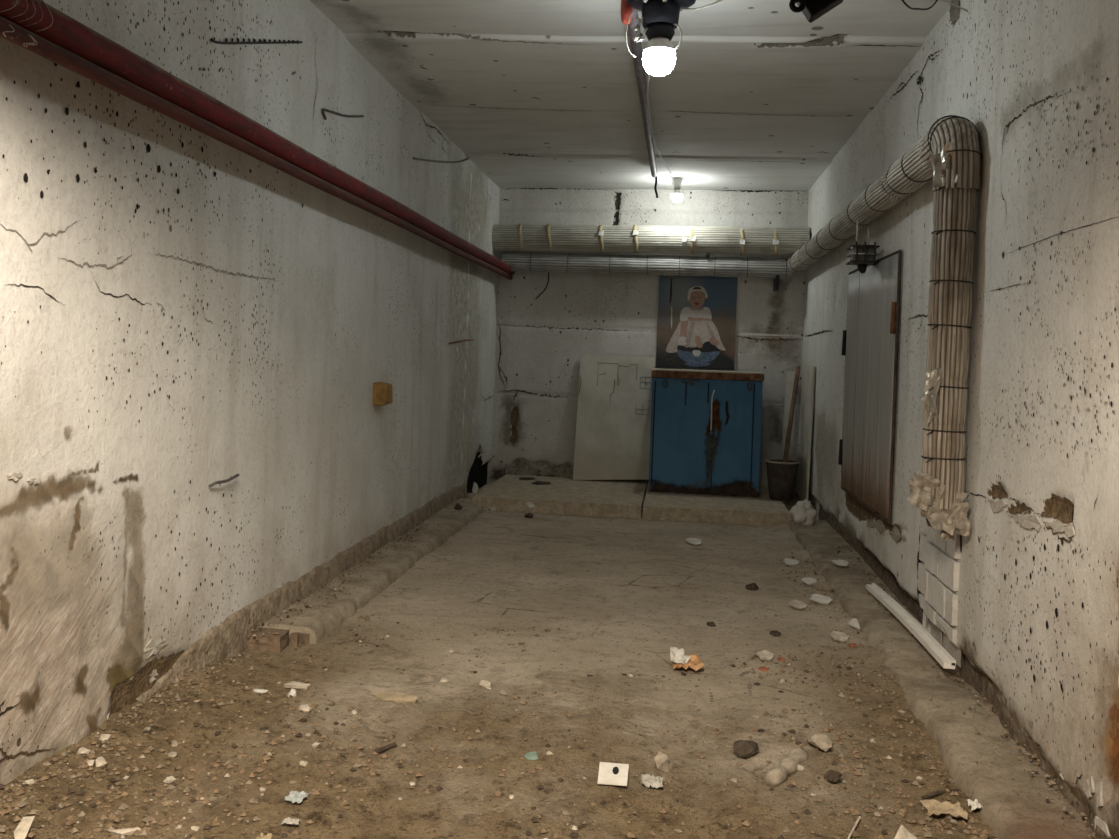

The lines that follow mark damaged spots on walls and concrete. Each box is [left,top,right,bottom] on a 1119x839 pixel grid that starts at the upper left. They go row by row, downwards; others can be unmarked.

crack [1,220,279,311]
damp [0,463,102,550]
damp [0,548,19,629]
damp [107,474,145,692]
spalling [987,481,1083,689]
damp [21,686,39,713]
damp [76,665,87,693]
damp [86,710,100,737]
rust [1106,698,1119,780]